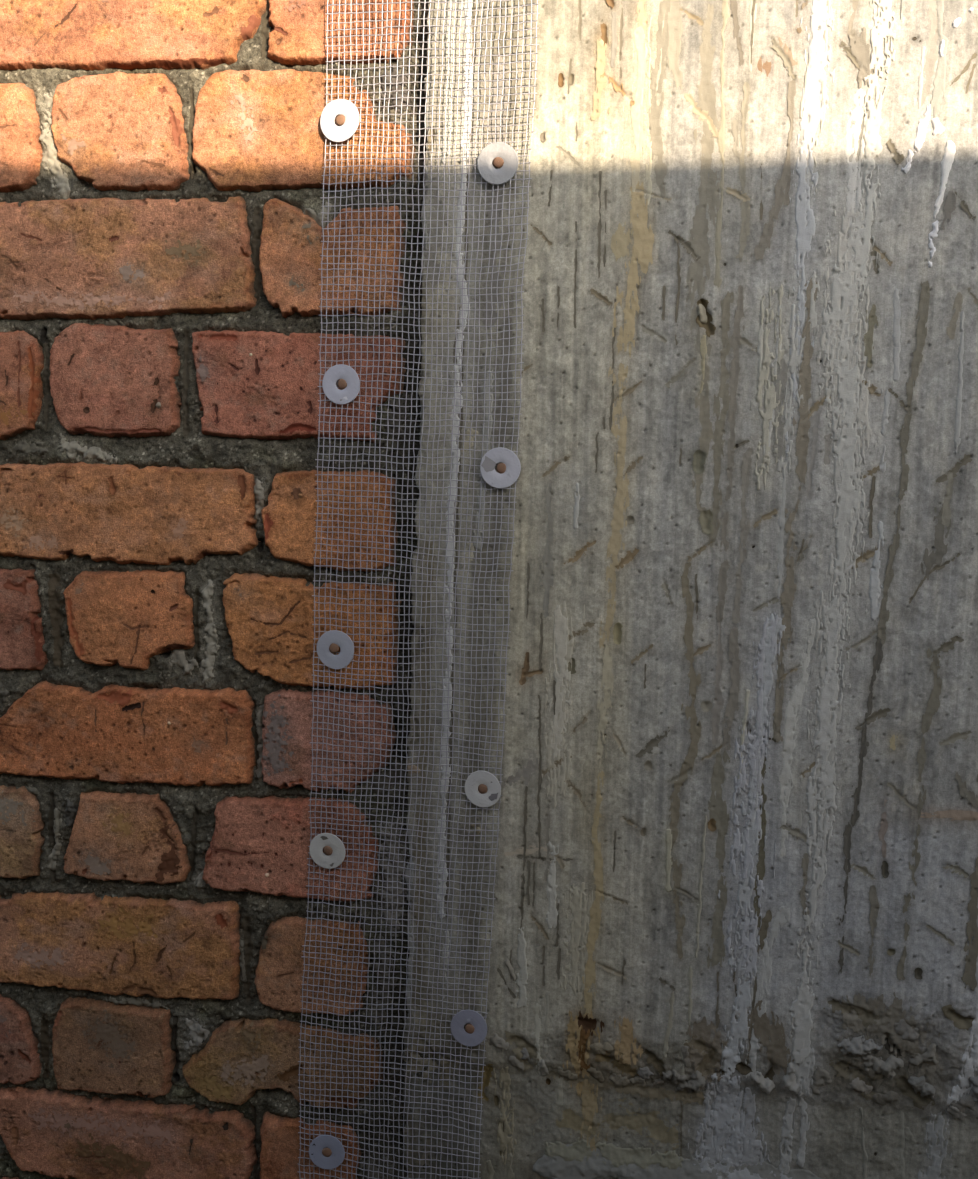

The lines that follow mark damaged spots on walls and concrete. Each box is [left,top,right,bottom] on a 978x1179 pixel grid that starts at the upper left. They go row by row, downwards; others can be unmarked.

efflorescence [918,0,948,118]
water stain [941,190,957,230]
water stain [515,0,943,1179]
water stain [498,483,593,1007]
spalling [941,1004,978,1030]
corrosion [563,1010,643,1097]
spalling [595,1049,667,1077]
spalling [683,1035,778,1080]
spalling [895,1074,935,1110]